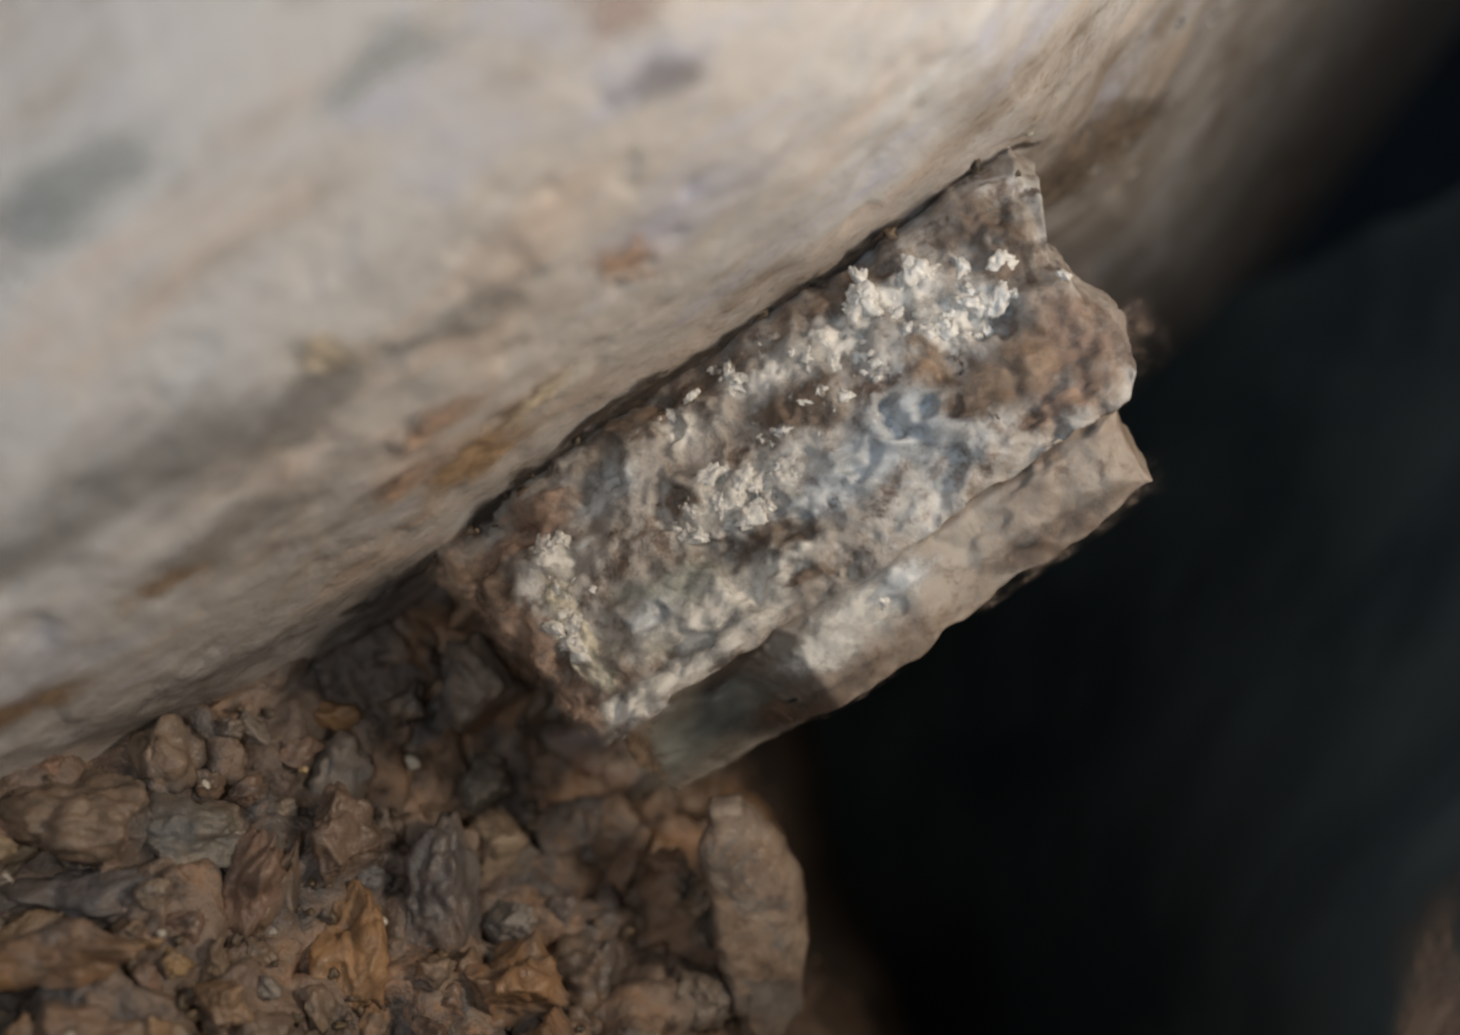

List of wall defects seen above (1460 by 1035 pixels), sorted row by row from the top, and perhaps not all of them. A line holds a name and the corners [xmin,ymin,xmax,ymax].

crack [343,140,1043,616]
damp [533,249,1020,780]
damp [1055,268,1073,282]